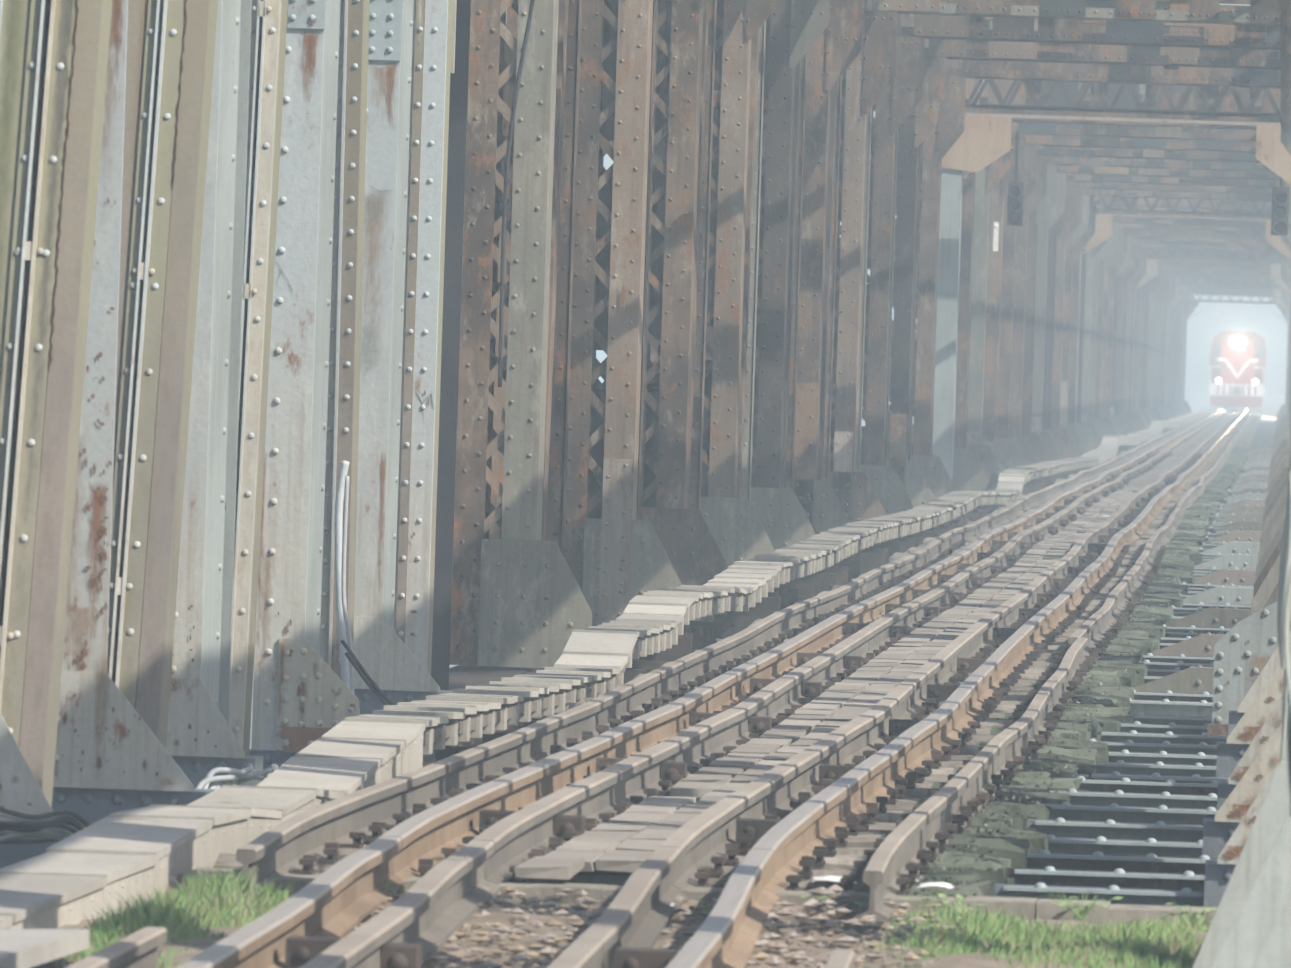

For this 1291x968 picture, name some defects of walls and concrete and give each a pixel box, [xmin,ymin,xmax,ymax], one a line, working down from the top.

rust [108,0,121,83]
rust [293,6,316,88]
rust [380,66,396,114]
rust [65,448,112,671]
rust [259,461,332,752]